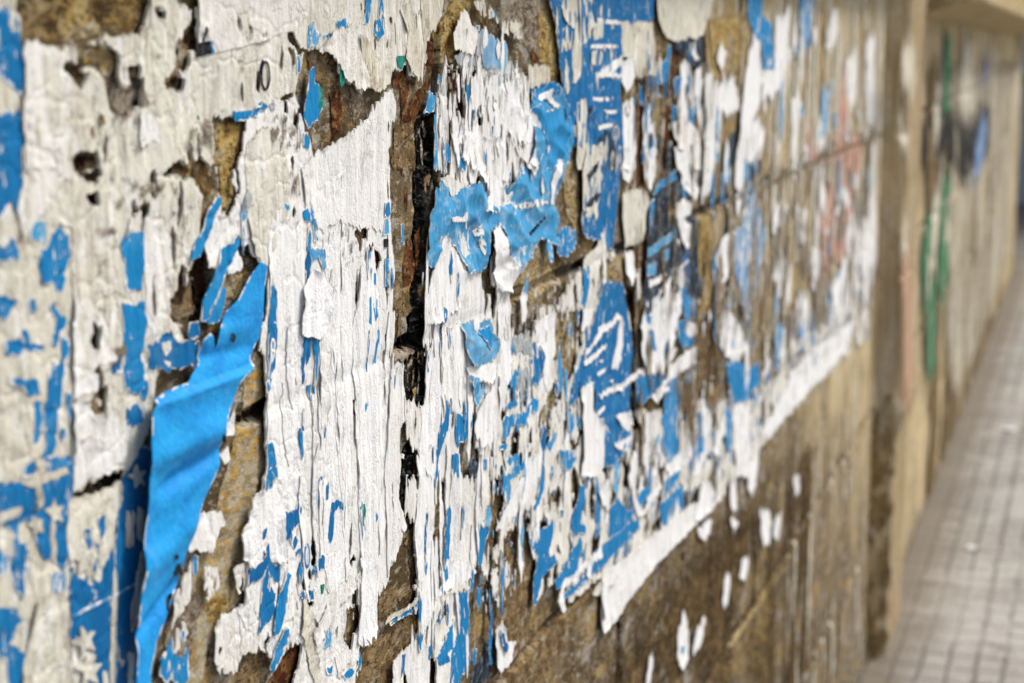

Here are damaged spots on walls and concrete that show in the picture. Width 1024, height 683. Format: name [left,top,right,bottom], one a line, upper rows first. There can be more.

spalling [480,0,559,78]
spalling [709,0,761,83]
spalling [427,54,462,118]
spalling [221,273,243,319]
crack [382,113,433,518]
spalling [510,248,562,334]
spalling [539,312,580,424]
spalling [459,437,479,477]
spalling [152,349,265,683]
spalling [435,482,444,563]
spalling [471,479,599,683]
spalling [237,644,299,683]